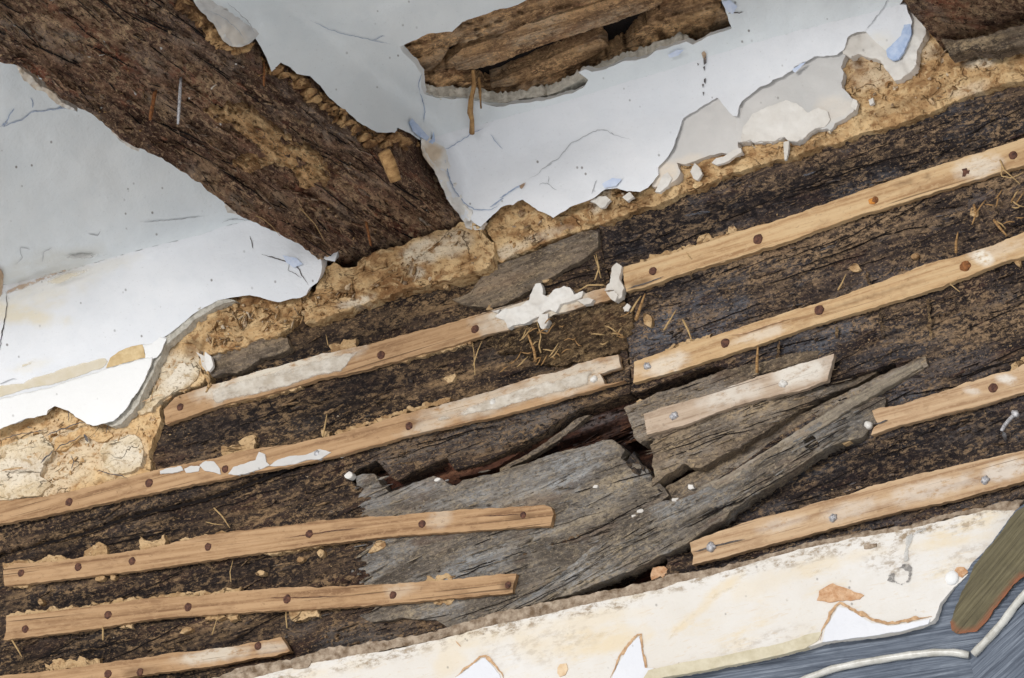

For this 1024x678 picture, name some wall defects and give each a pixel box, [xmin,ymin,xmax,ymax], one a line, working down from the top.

spalling [404,0,737,103]
peeling [0,0,442,255]
flaking render [409,119,488,230]
flaking render [590,178,635,209]
flaking render [652,51,875,194]
flaking render [104,299,240,429]
peeling [239,377,413,446]
peeling [287,456,369,482]
peeling [236,548,333,589]
peeling [612,637,654,678]
peeling [817,583,930,642]
peeling [950,507,1024,634]